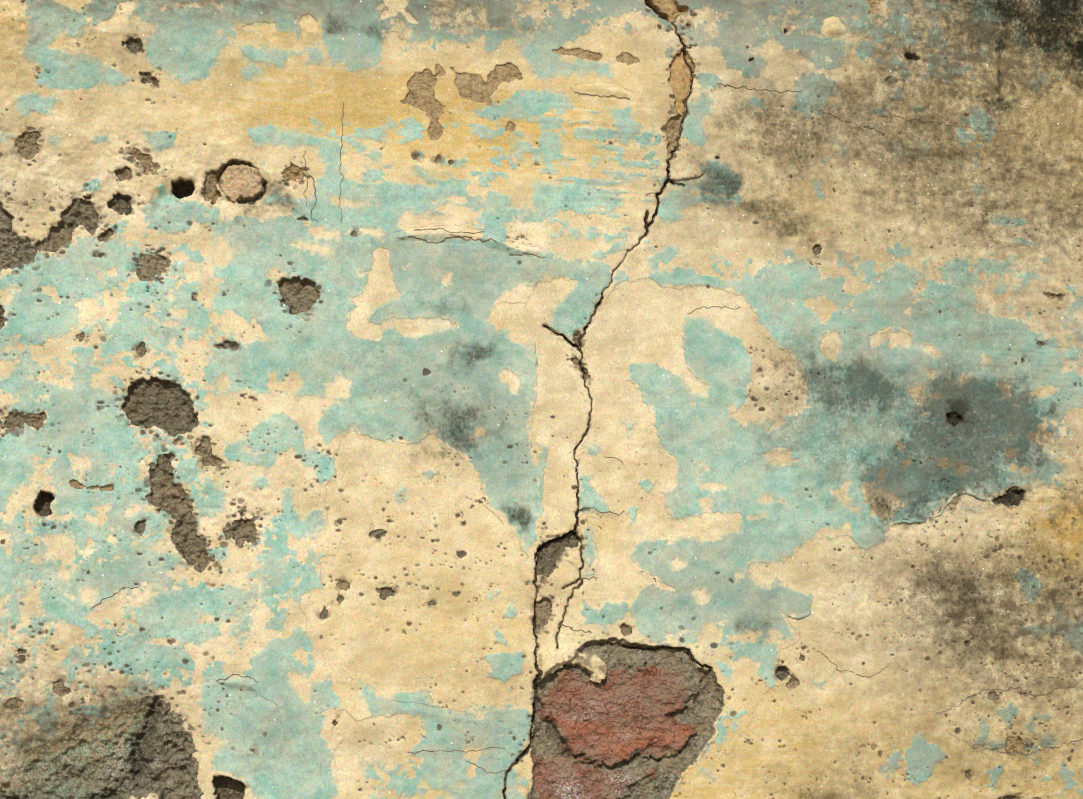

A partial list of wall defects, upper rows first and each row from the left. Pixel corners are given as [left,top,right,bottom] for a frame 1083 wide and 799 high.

leakage [969,0,1083,65]
spalling [15,131,39,160]
peeling [400,62,523,141]
spalling [0,148,160,270]
spalling [276,276,321,315]
spalling [122,376,222,467]
crack [400,23,1025,799]
spalling [134,520,147,536]
spalling [145,453,210,573]
peeling [299,276,1061,799]
crack [936,686,1082,714]
spalling [0,695,204,799]